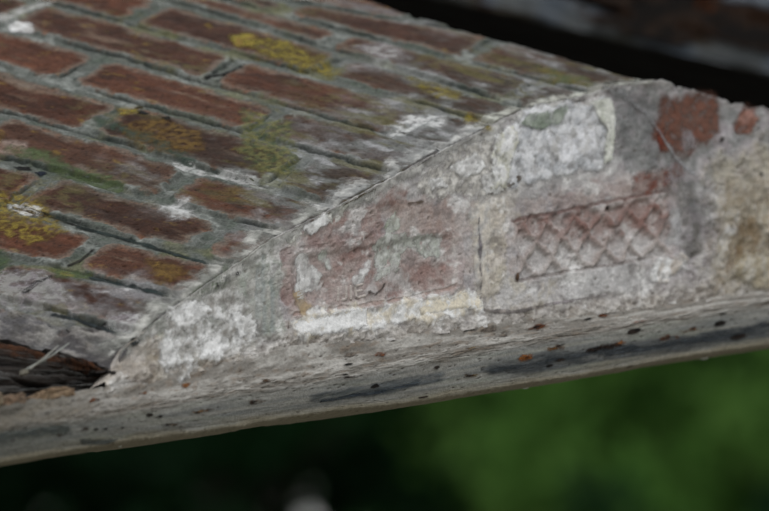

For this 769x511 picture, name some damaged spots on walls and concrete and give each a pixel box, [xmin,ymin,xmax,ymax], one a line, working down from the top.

spalling [633,92,719,195]
corrosion [587,340,626,352]
damp [483,322,769,374]